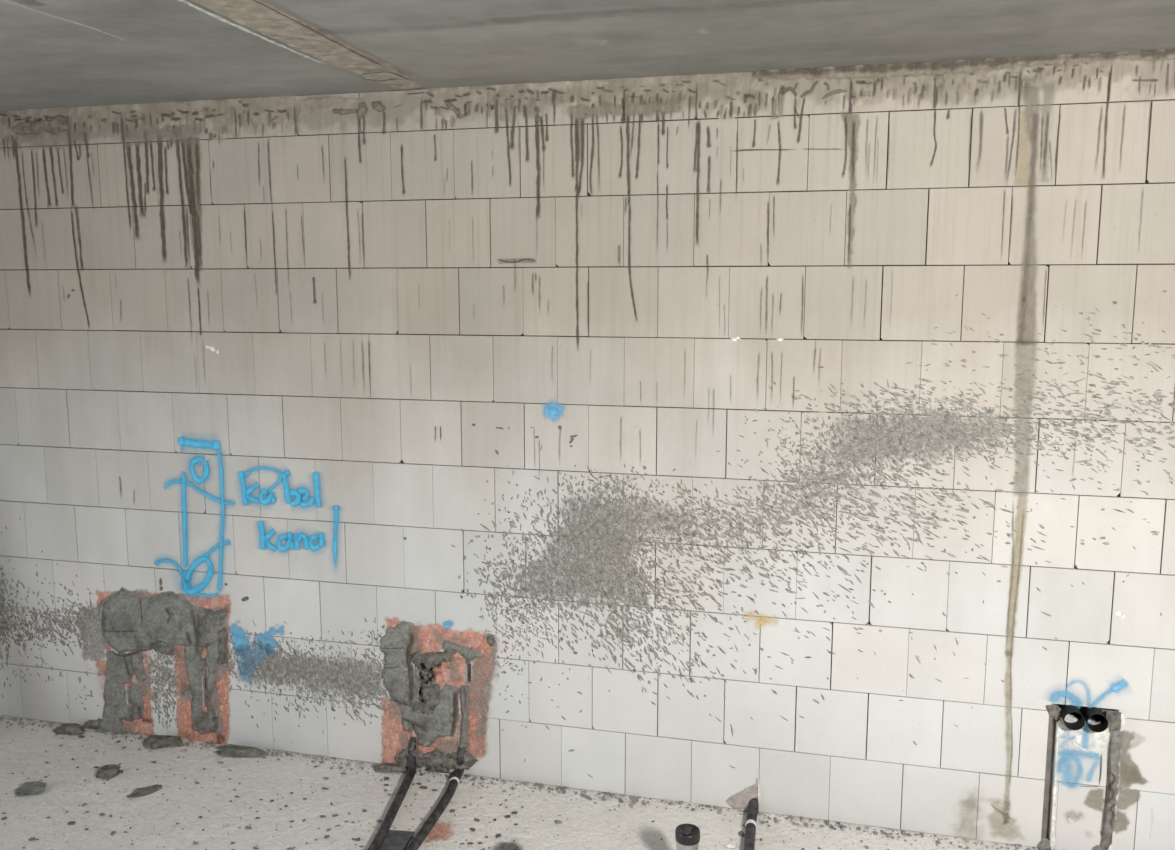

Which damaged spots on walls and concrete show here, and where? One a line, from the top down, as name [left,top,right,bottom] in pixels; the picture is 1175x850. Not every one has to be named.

damp [0,109,226,335]
damp [239,104,289,191]
damp [272,215,288,292]
damp [332,101,386,275]
damp [1133,64,1169,94]
damp [424,63,1111,833]